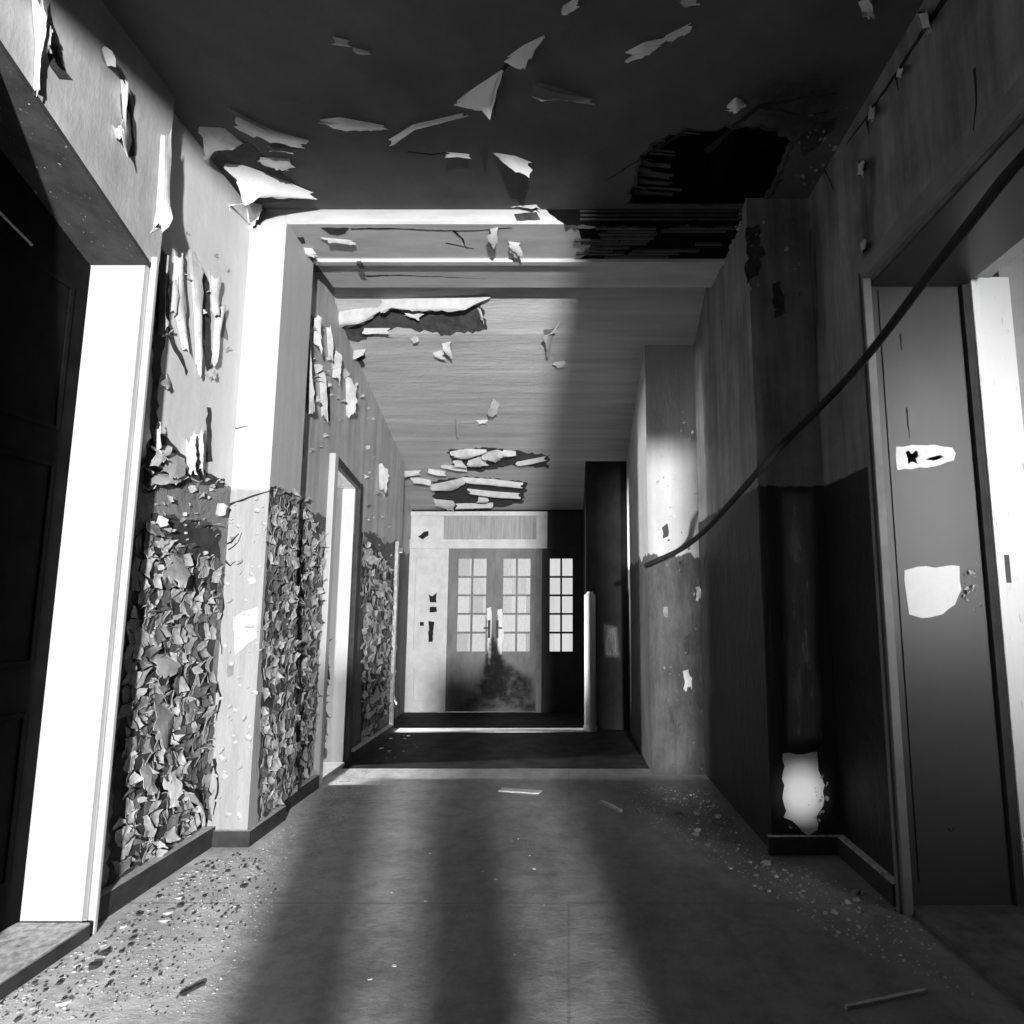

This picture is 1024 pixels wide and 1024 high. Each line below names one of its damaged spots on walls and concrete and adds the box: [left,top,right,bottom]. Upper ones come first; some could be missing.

peeling [106,248,335,887]